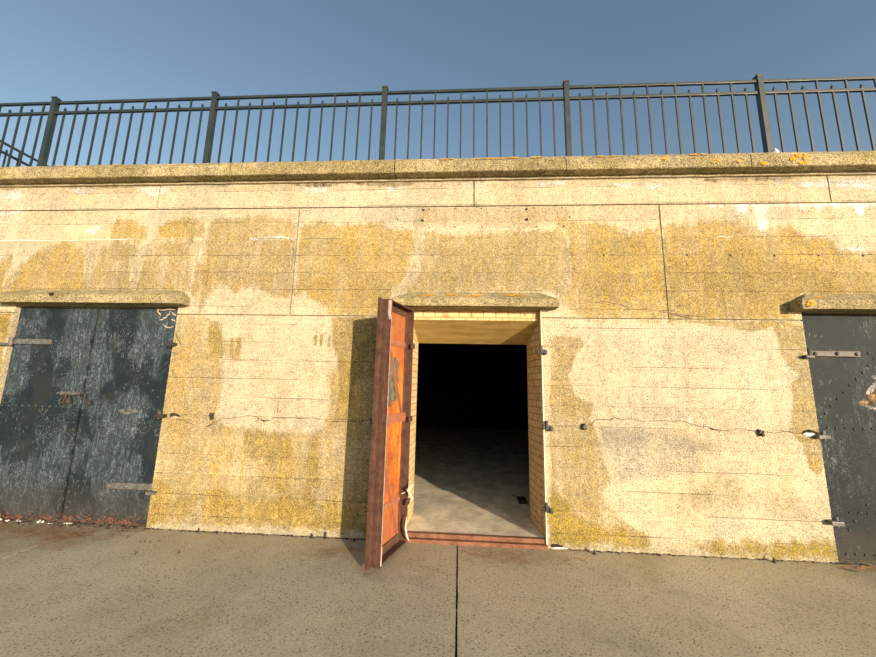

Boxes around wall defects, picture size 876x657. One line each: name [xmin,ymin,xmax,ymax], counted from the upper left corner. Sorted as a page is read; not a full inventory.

damp [0,203,876,548]
damp [713,541,838,560]